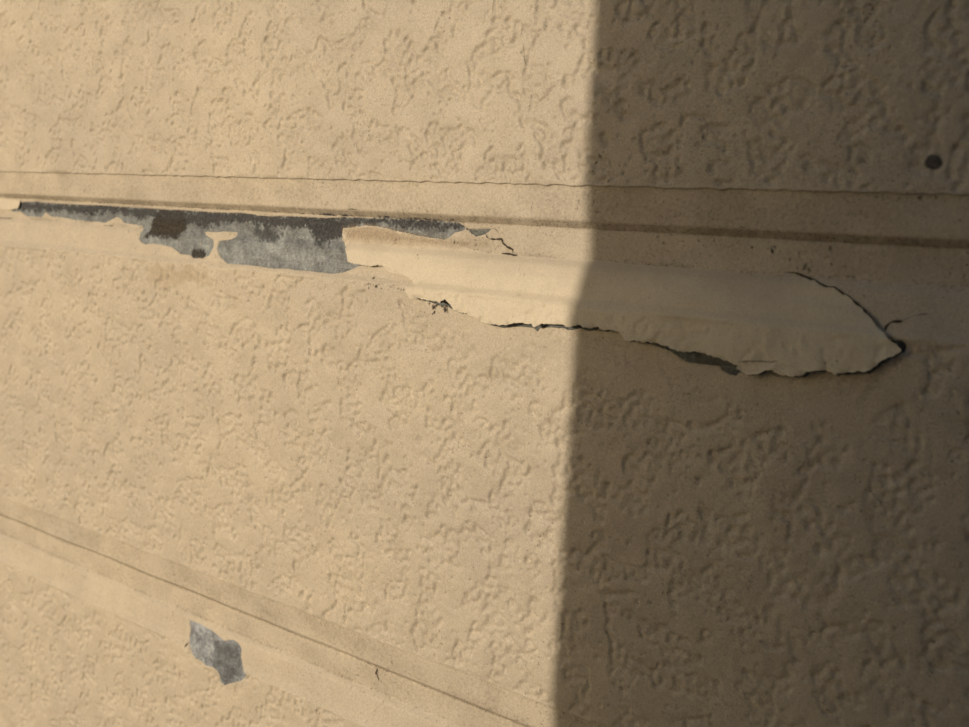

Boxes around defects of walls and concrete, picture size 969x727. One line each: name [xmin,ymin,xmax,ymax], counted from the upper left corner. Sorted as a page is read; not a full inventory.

peeling [0,199,906,378]
peeling [185,620,246,685]